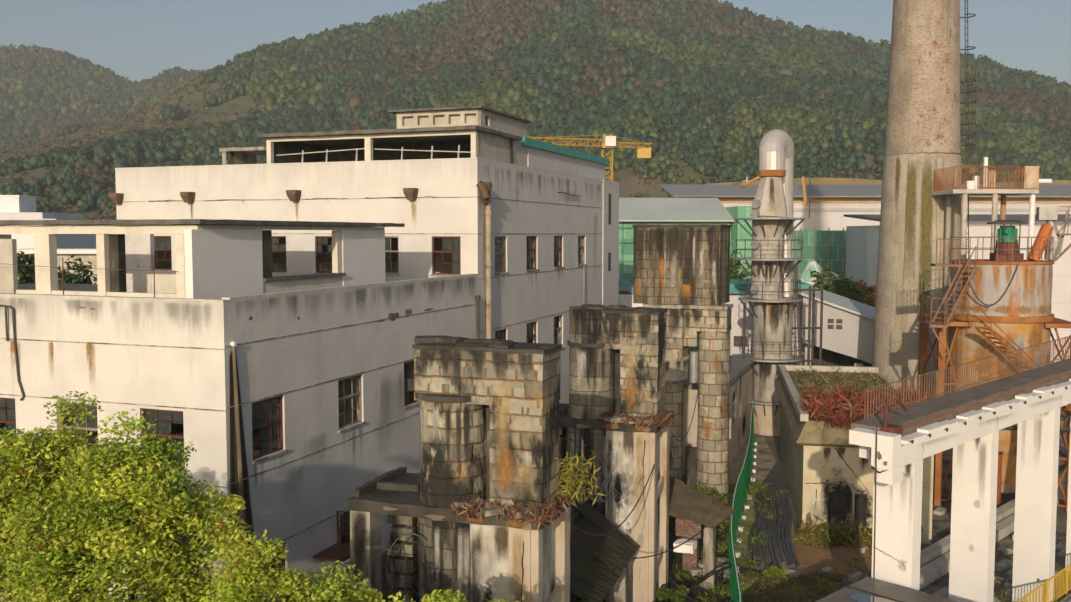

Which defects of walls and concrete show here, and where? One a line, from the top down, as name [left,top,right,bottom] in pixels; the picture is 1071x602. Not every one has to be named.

leakage [895,160,916,250]
rust [965,267,1011,293]
rust [1025,266,1053,293]
rust [960,304,1052,314]
crack [517,542,525,602]